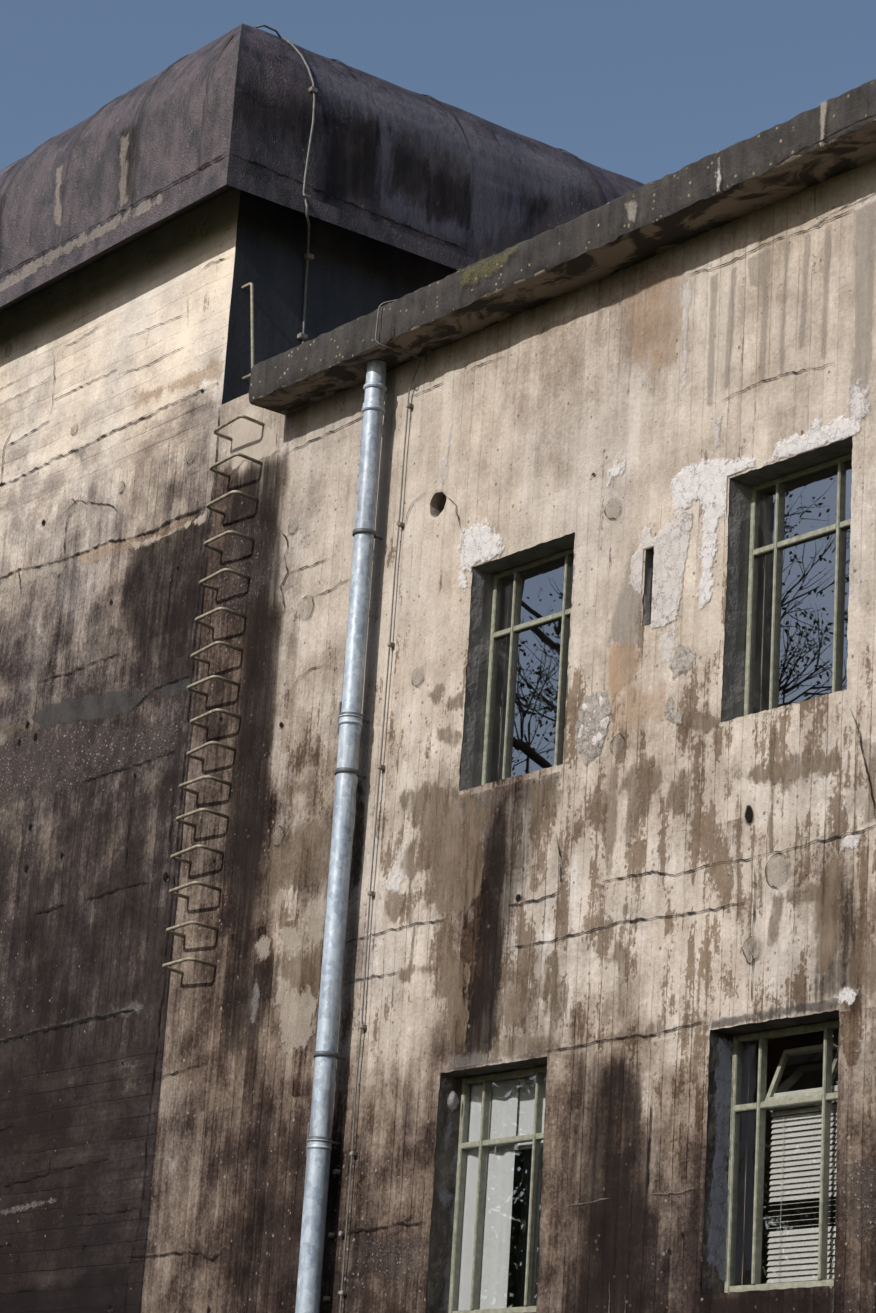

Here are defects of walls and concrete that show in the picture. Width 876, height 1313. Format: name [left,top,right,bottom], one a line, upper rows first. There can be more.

spalling [575,691,611,765]
crack [0,299,225,1307]
water stain [350,782,364,887]
water stain [594,760,689,868]
water stain [385,777,568,1069]
water stain [613,942,626,972]
water stain [765,1004,819,1018]
water stain [768,852,843,970]